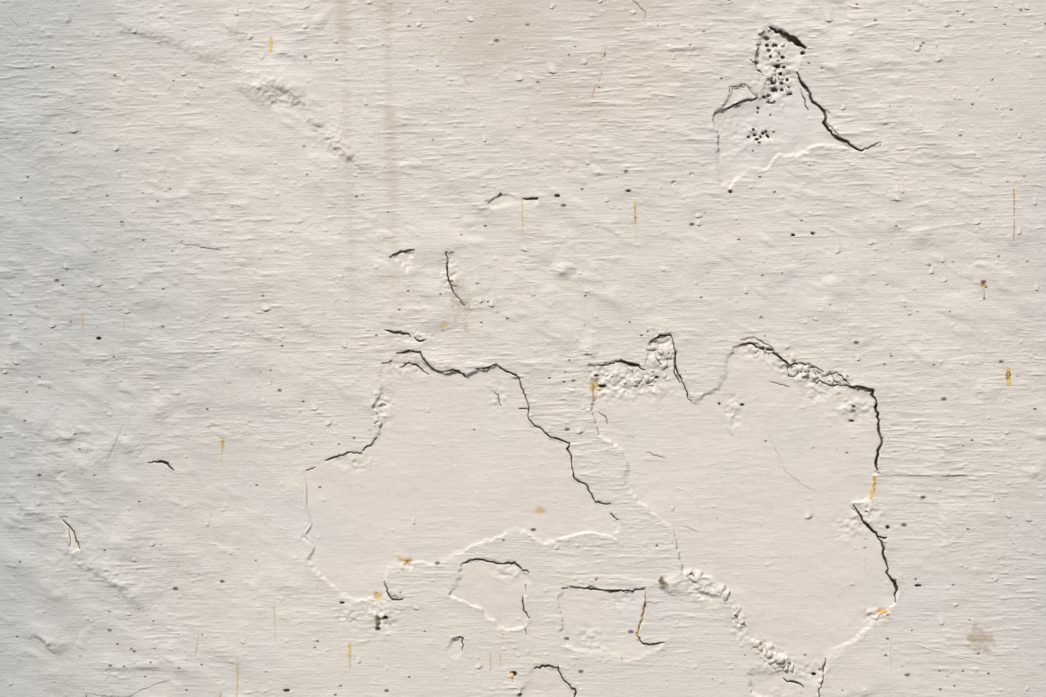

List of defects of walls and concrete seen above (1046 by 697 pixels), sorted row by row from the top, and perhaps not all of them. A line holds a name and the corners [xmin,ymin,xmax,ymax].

crack [770,27,806,48]
crack [723,53,762,110]
crack [798,74,877,151]
crack [600,335,688,398]
crack [382,330,616,519]
crack [742,338,966,490]
crack [469,559,529,573]
crack [853,505,898,603]
crack [563,586,665,645]
crack [534,665,577,697]